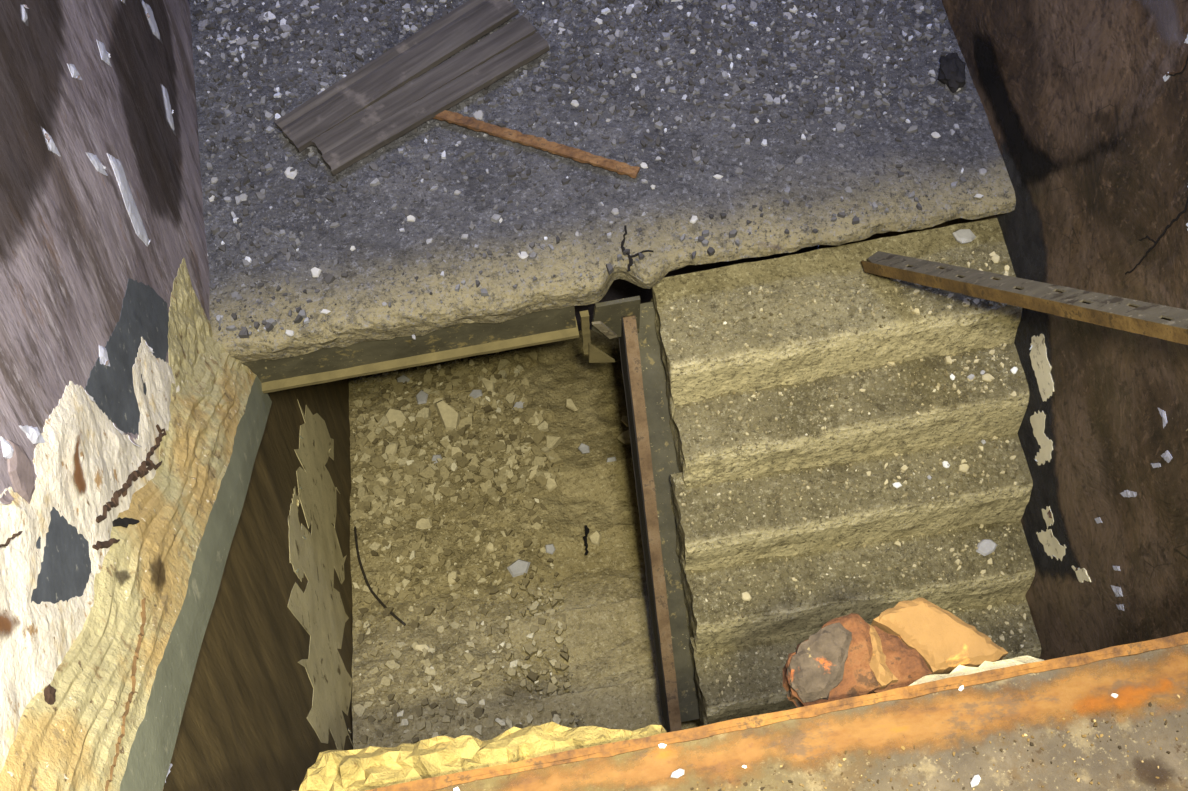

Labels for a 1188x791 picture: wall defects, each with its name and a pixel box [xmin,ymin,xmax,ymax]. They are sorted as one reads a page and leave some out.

peeling [43,128,61,157]
peeling [67,64,82,80]
peeling [97,40,112,67]
peeling [162,85,174,131]
peeling [85,152,150,247]
crack [621,225,654,271]
crack [1125,197,1188,275]
spalling [0,258,212,773]
corrosion [105,598,146,791]
corrosion [498,649,1188,791]